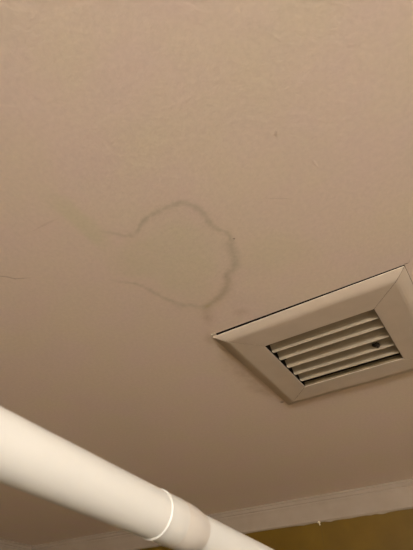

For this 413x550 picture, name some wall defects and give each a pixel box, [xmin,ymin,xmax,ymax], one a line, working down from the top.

leakage [89,197,285,405]